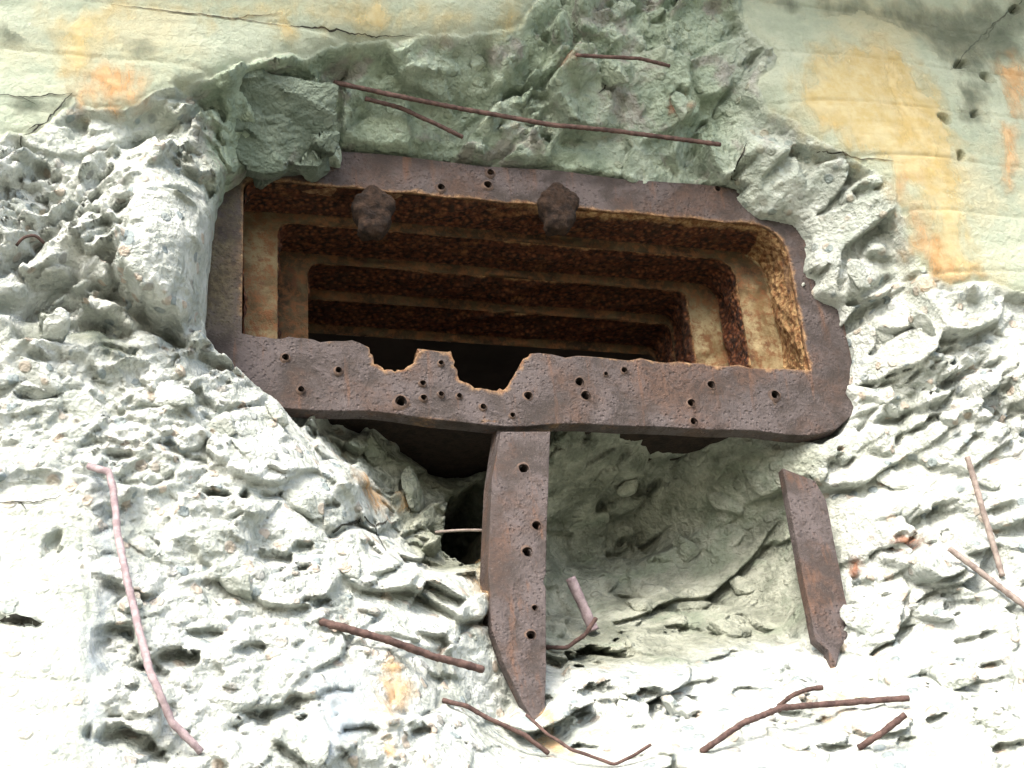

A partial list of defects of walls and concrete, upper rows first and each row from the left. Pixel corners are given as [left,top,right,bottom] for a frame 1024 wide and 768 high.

spalling [218,0,776,206]
rust [805,47,972,279]
spalling [726,97,1024,642]
spalling [150,381,196,407]
spalling [231,434,278,465]
spalling [281,488,325,519]
spalling [309,428,487,582]
spalling [543,431,839,672]
spalling [878,669,910,687]
spalling [925,665,977,690]
spalling [974,706,1022,735]
spalling [766,724,811,752]